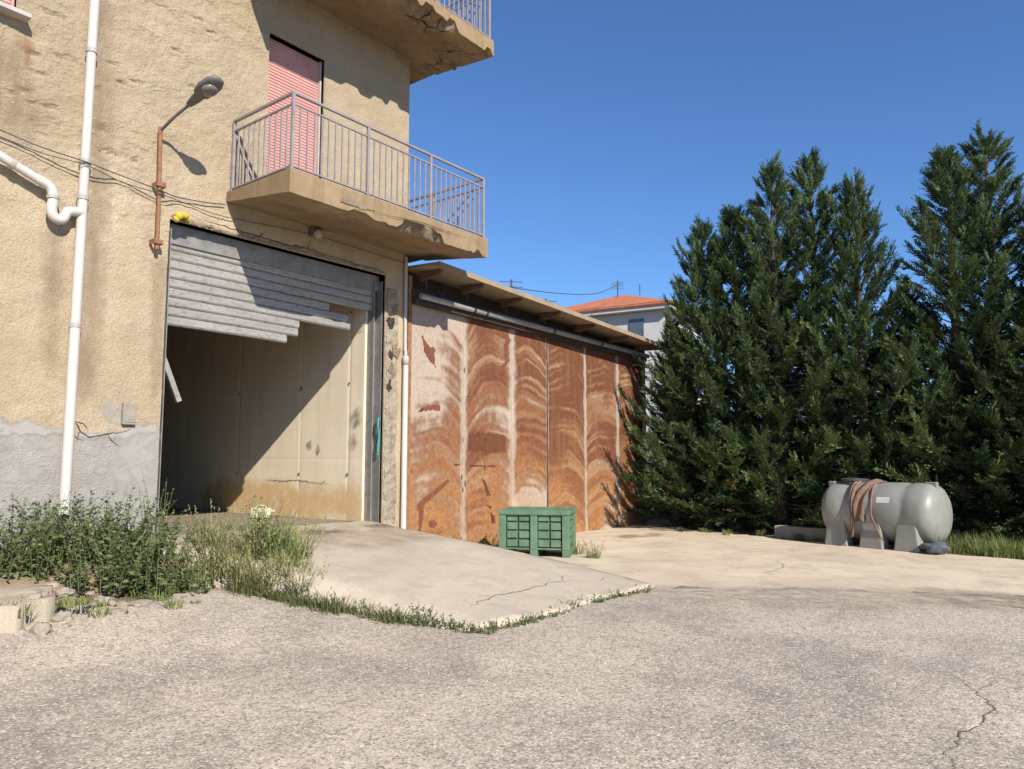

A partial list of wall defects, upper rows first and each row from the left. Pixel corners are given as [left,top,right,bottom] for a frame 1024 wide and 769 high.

spalling [401,0,479,73]
spalling [384,220,444,245]
peeling [0,418,158,510]
leakage [205,483,358,534]
spalling [382,288,401,525]
rust [409,318,644,545]
crack [939,680,1023,769]